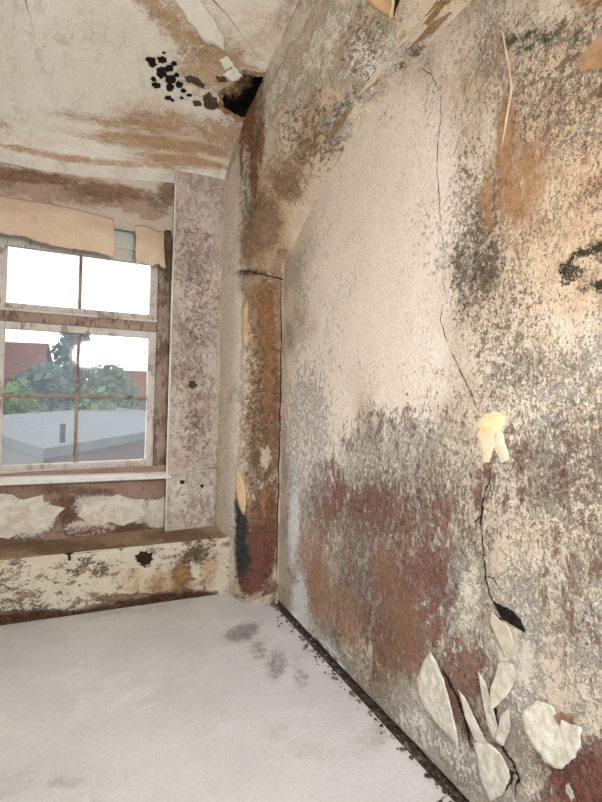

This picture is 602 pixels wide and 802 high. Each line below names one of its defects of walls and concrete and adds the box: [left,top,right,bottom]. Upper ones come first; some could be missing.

leakage [130,0,243,147]
peeling [324,0,452,143]
leakage [448,92,547,323]
leakage [558,241,602,294]
corrosion [248,274,277,468]
peeling [0,493,65,539]
peeling [77,494,165,526]
leakage [285,461,349,672]
leakage [455,546,483,651]
crack [474,459,499,603]
peeling [416,611,520,802]
peeling [522,700,582,769]